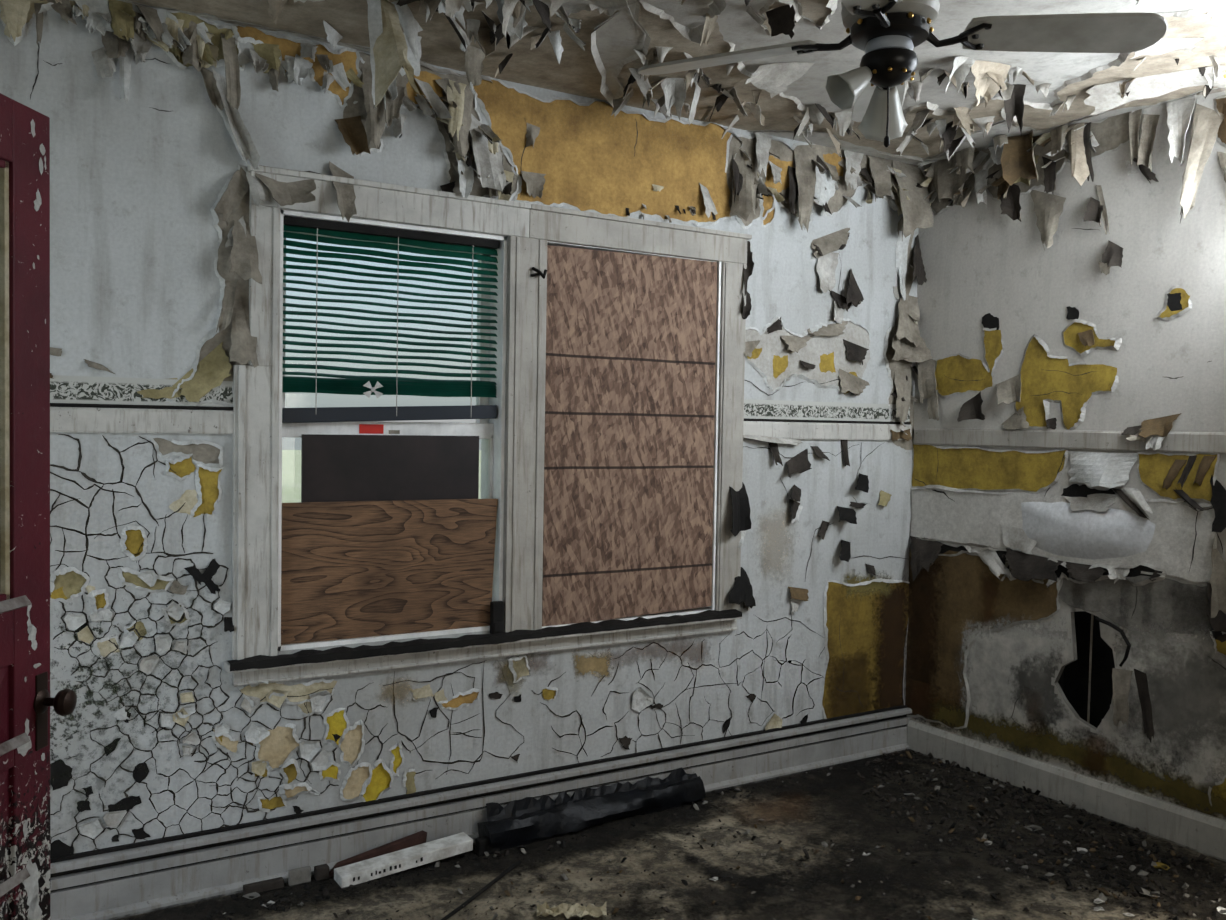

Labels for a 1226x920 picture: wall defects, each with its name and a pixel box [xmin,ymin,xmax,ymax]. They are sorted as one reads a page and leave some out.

peeling [0,0,1226,250]
peeling [137,165,316,407]
peeling [151,437,225,518]
flaking render [725,132,1226,807]
peeling [25,605,41,682]
peeling [50,567,109,633]
peeling [118,525,220,626]
crack [50,434,826,851]
peeling [17,719,93,812]
peeling [108,762,149,812]
leakage [930,699,1226,818]
peeling [24,858,42,920]